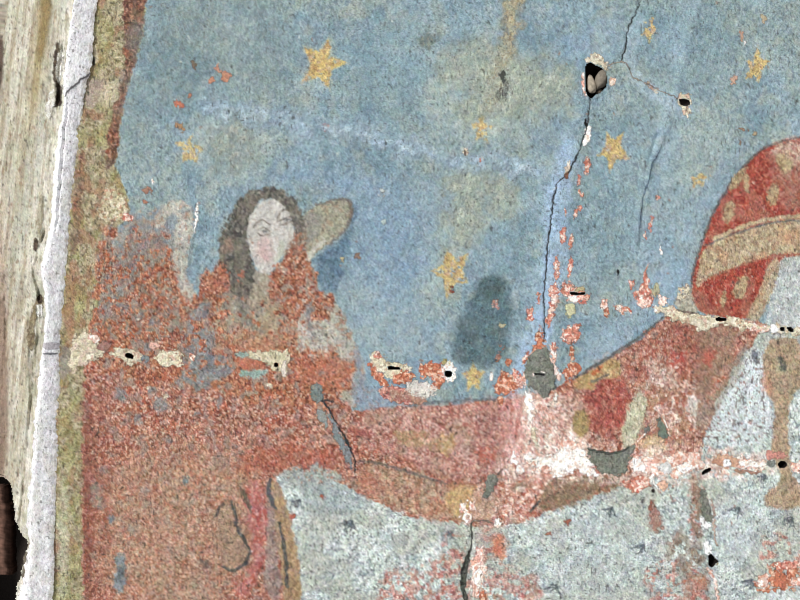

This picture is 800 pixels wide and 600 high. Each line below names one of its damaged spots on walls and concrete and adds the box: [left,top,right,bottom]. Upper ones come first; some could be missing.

crack [603,2,678,99]
crack [543,98,592,337]
peeling [564,157,592,219]
crack [639,150,660,228]
peeling [67,332,195,374]
peeling [248,349,290,377]
peeling [367,351,457,405]
leakage [453,277,510,364]
peeling [490,227,590,446]
peeling [747,323,769,333]
spalling [0,523,28,600]
crack [460,519,492,600]